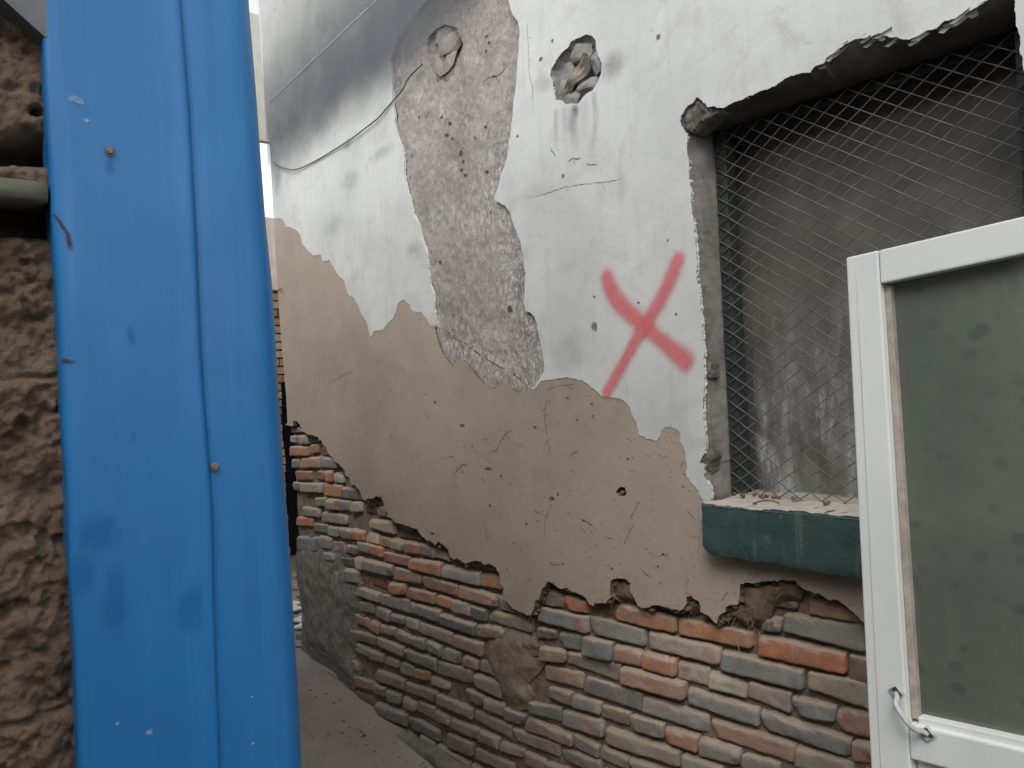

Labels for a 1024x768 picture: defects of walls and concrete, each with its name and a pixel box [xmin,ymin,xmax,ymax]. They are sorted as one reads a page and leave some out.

spalling [818,1,985,69]
crack [535,150,623,197]
crack [350,384,731,613]
spalling [274,0,872,768]